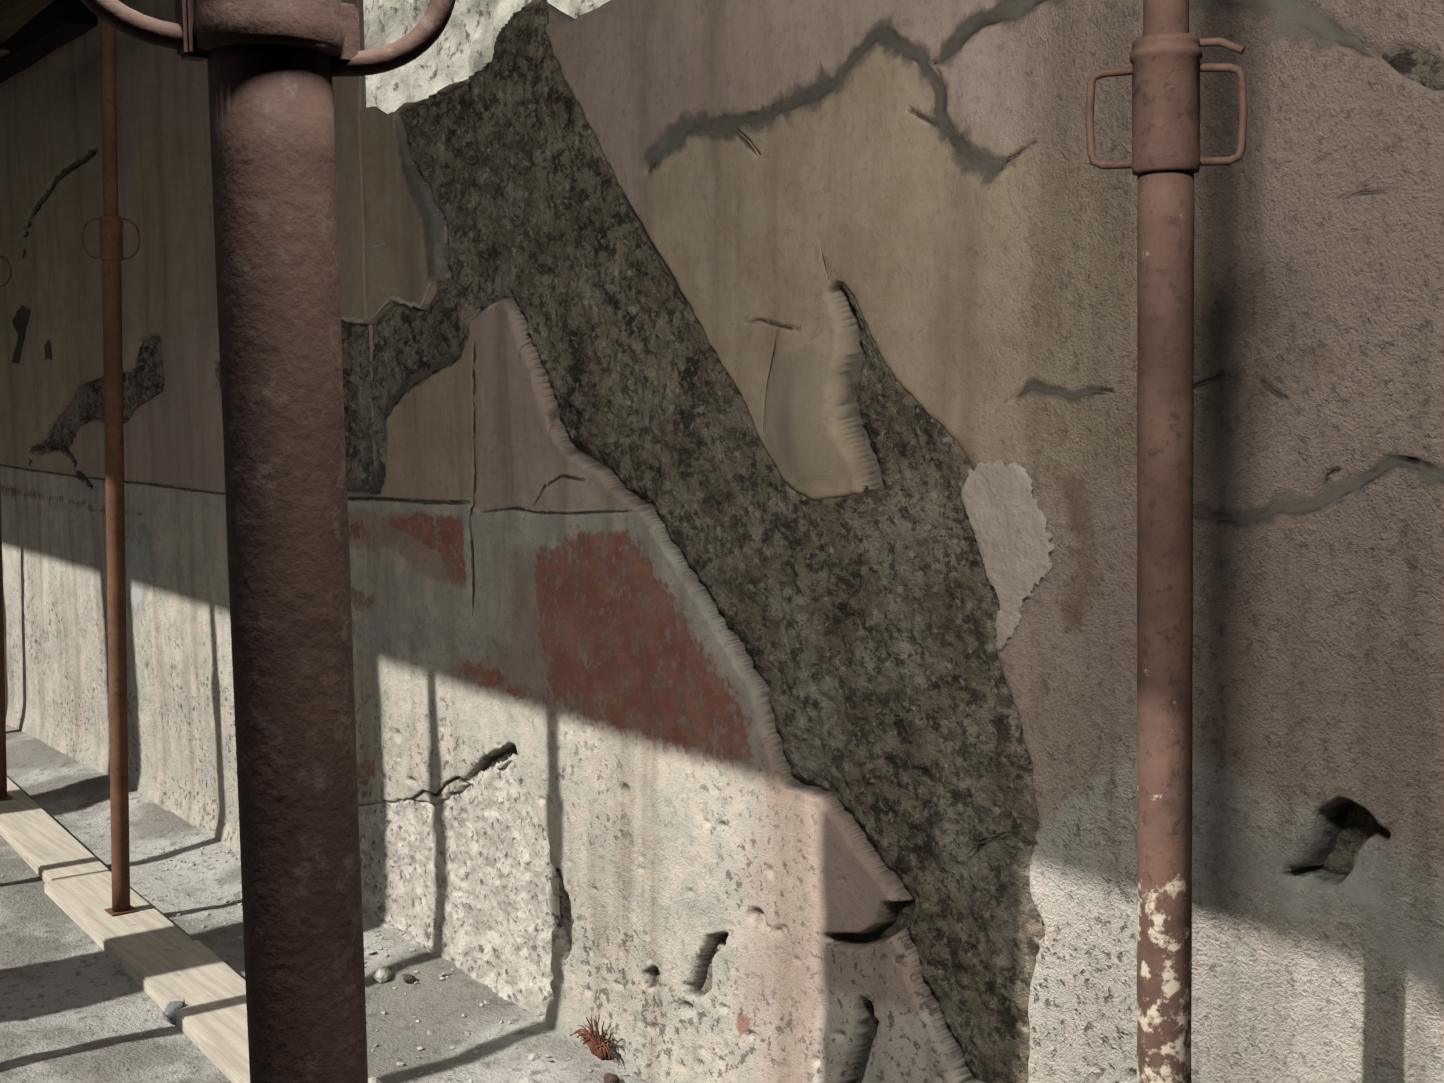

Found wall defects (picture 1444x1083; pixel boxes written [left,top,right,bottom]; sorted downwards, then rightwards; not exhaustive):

crack [621,0,1061,305]
spalling [41,378,104,453]
spalling [123,335,165,423]
crack [1016,379,1107,402]
crack [1193,456,1444,527]
spalling [341,0,1045,1083]
crack [413,777,469,799]
spalling [1319,803,1386,875]